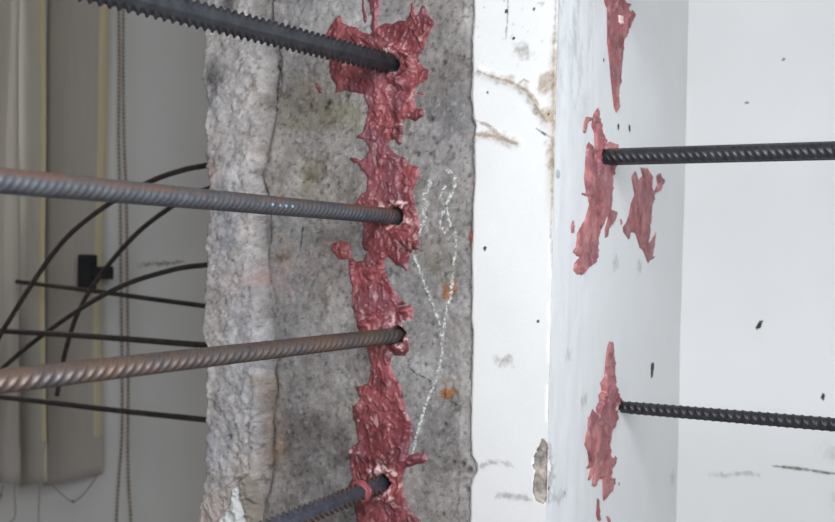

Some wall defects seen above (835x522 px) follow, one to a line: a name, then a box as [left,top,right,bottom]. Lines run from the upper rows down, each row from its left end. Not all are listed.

peeling [605,209,623,238]
spalling [239,474,264,522]
peeling [596,498,611,522]